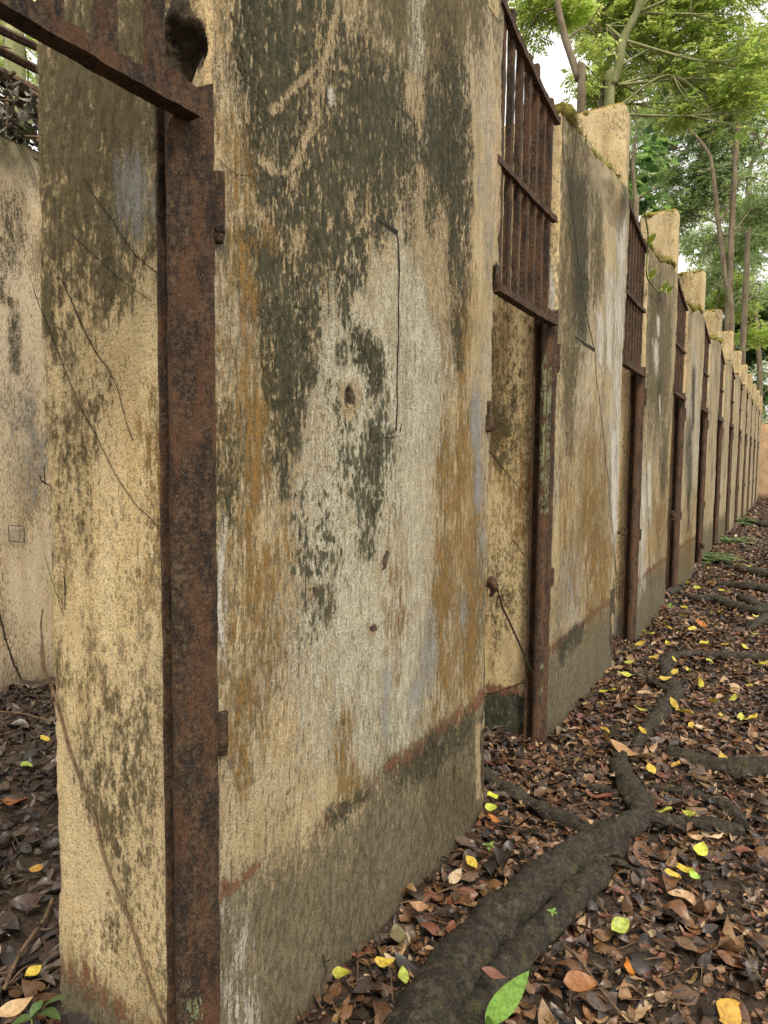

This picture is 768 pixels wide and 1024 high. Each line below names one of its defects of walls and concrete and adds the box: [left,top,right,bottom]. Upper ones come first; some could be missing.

leakage [117,0,143,66]
leakage [0,42,160,568]
leakage [215,0,530,852]
leakage [556,161,628,668]
mould [53,625,163,964]
efflorescence [221,907,260,1024]